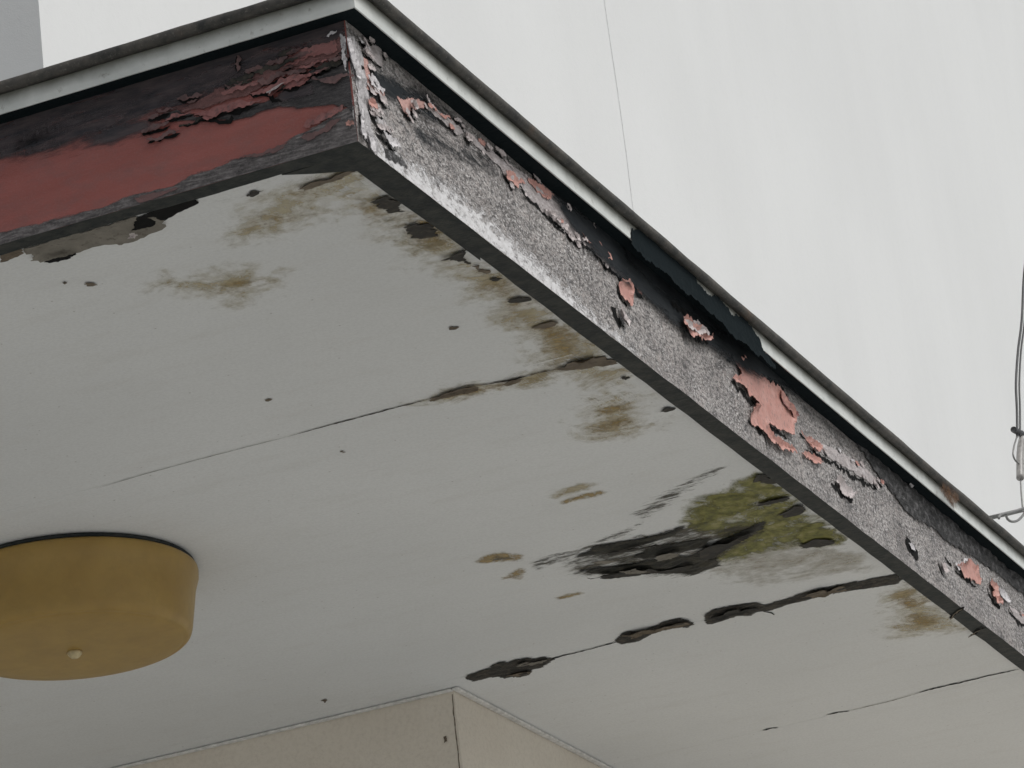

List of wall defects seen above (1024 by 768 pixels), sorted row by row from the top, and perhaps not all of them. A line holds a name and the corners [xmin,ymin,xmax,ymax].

water stain [239,172,402,235]
peeling [0,30,644,328]
water stain [162,275,251,294]
peeling [671,301,714,345]
crack [106,369,556,486]
water stain [589,397,634,439]
peeling [727,355,884,503]
peeling [937,557,1024,627]
crack [828,669,1018,715]